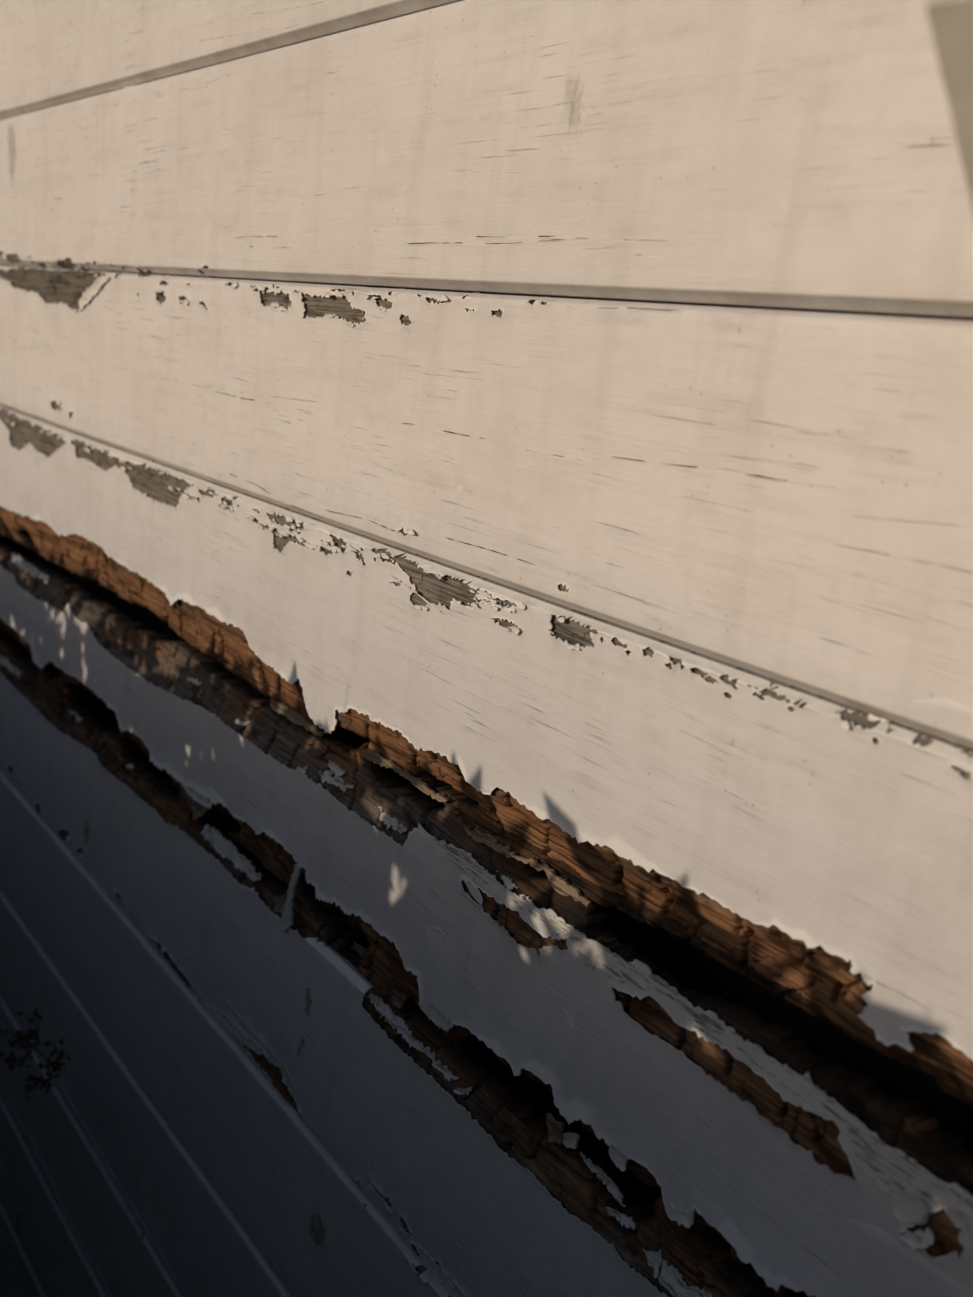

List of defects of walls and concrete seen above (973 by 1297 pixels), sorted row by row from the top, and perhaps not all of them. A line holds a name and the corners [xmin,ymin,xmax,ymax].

peeling [0,251,480,327]
peeling [0,655,23,678]
peeling [544,609,821,712]
peeling [296,760,353,793]
peeling [837,703,973,780]
peeling [181,784,262,882]
peeling [377,805,408,833]
peeling [496,871,534,904]
peeling [148,937,299,1118]